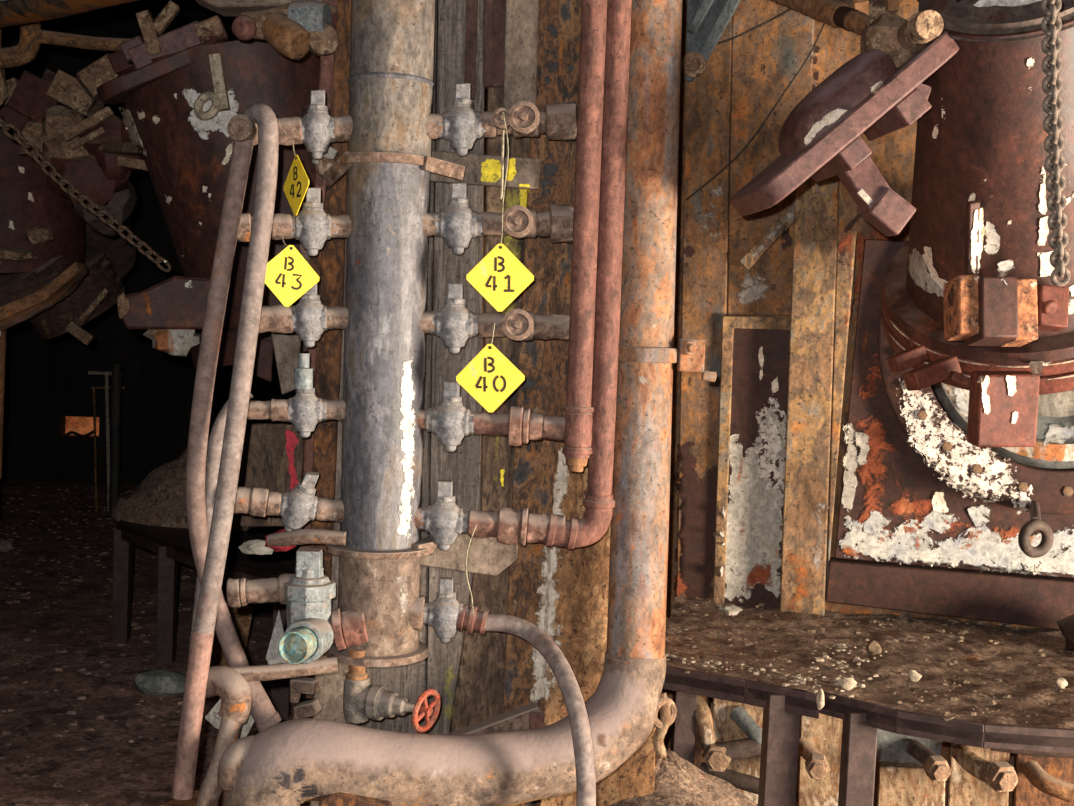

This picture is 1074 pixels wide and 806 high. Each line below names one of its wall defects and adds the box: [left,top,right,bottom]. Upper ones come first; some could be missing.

corrosion [811,44,821,90]
water stain [552,447,569,516]
peeling [665,347,1074,721]
water stain [535,546,563,646]
water stain [530,649,557,703]